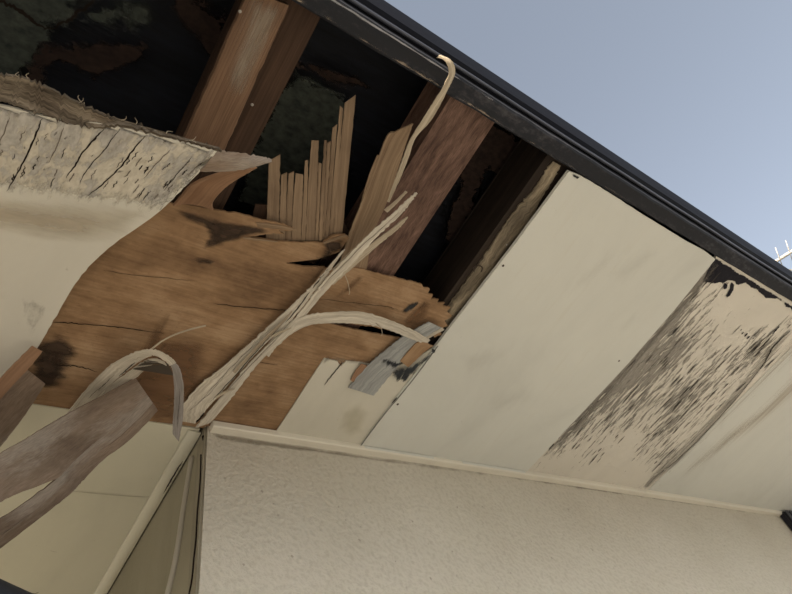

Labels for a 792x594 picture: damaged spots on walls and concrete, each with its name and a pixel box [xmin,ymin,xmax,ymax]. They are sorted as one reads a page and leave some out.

crack [0,107,212,205]
leakage [33,339,74,387]
peeling [350,364,367,382]
peeling [538,268,792,480]